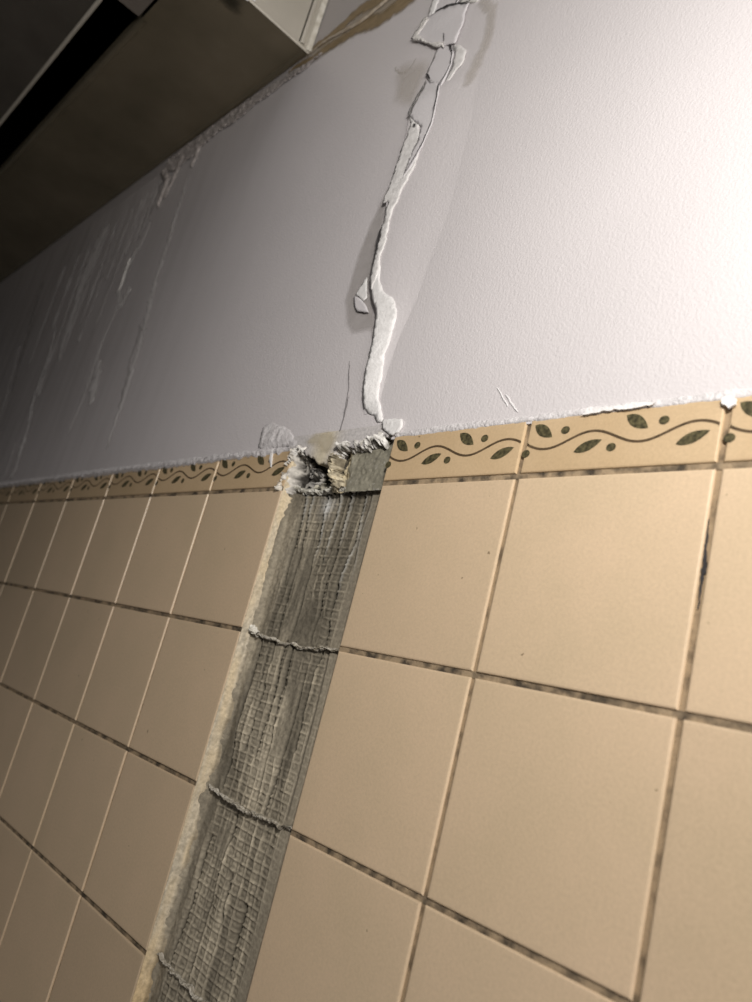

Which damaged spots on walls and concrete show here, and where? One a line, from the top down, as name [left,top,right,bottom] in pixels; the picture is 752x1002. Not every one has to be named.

crack [399,0,470,168]
leakage [4,180,161,478]
peeling [0,0,752,497]
crack [370,227,382,275]